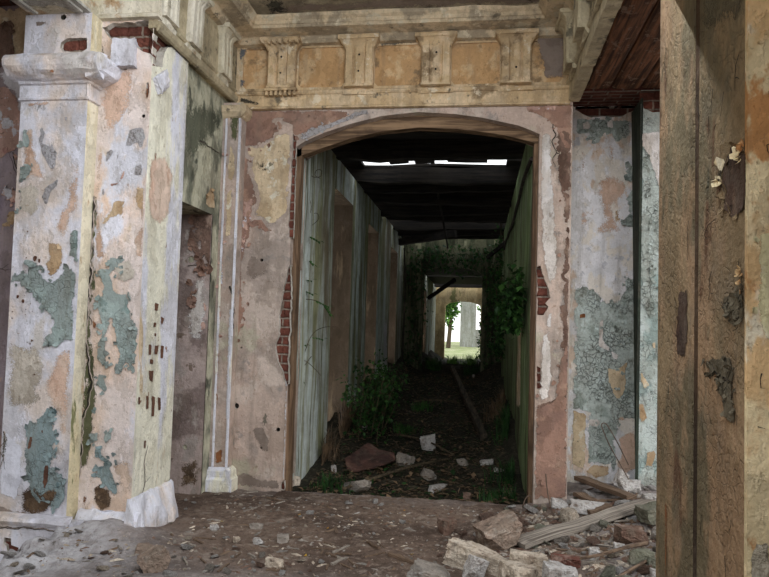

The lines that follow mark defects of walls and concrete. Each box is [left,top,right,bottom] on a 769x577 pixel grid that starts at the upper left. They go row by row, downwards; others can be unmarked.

peeling [0,87,43,227]
peeling [0,164,79,514]
peeling [93,157,173,395]
peeling [186,110,373,343]
spalling [275,265,293,384]
peeling [526,92,660,499]
peeling [711,141,746,220]
spalling [4,537,19,552]